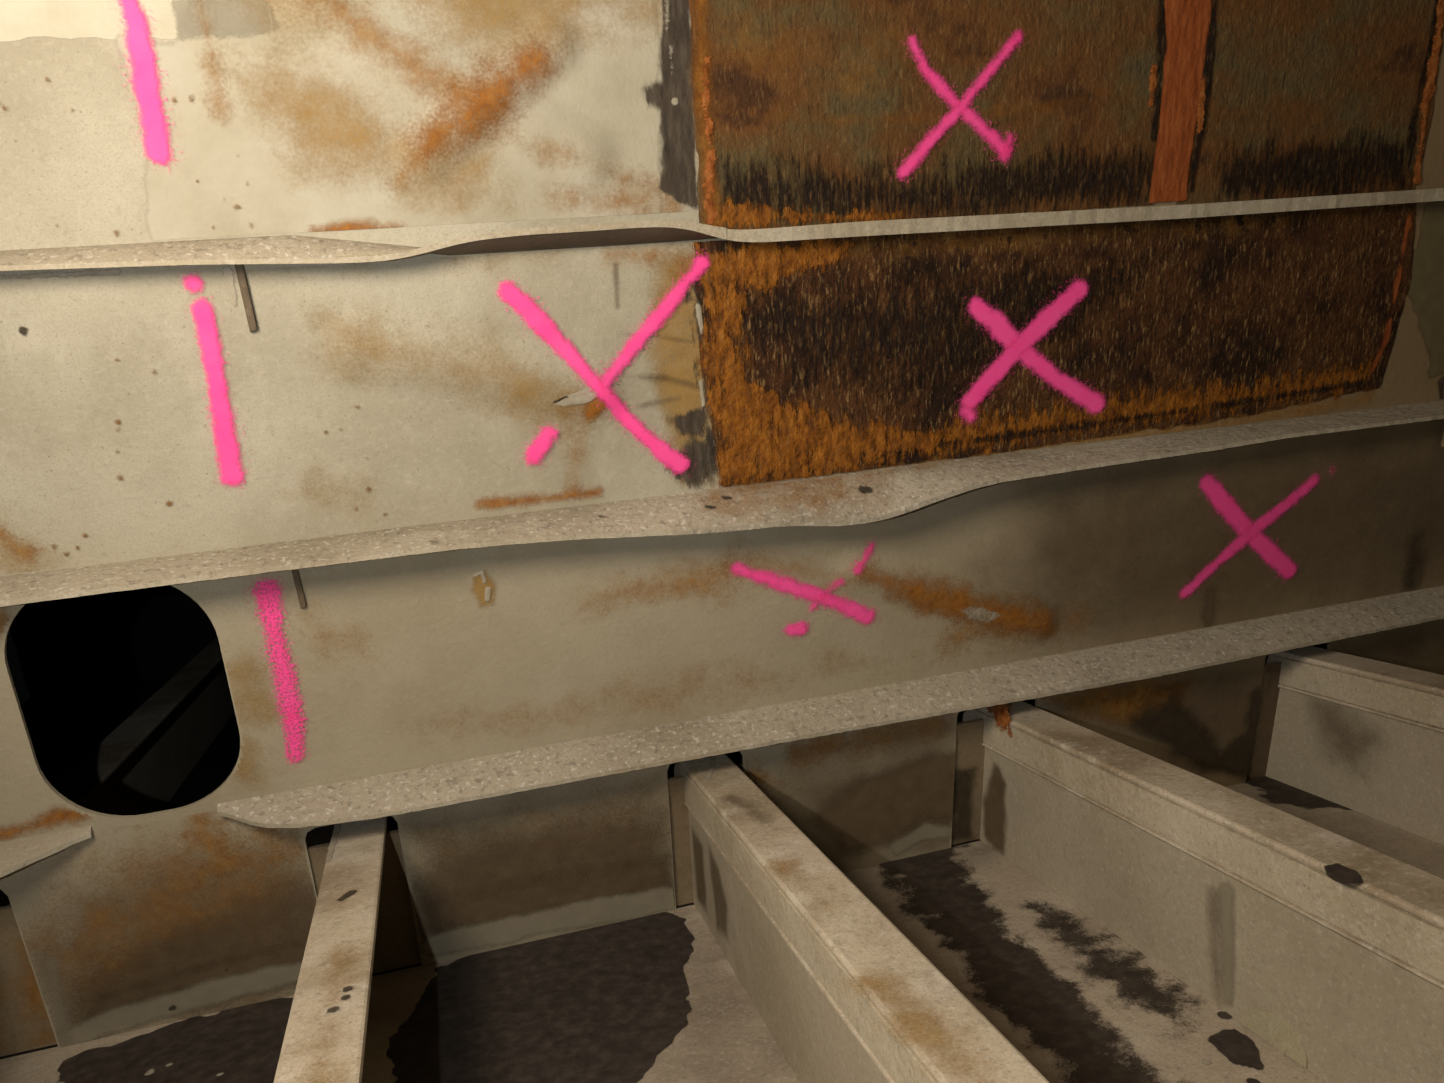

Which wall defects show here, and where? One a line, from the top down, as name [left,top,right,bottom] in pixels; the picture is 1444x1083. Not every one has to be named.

corrosion [270,7,550,182]
corrosion [689,0,1444,488]
corrosion [863,572,1051,637]
water stain [52,888,316,1083]
water stain [387,821,695,1083]
water stain [811,754,1199,1083]
water stain [1203,883,1264,1083]
water stain [1324,863,1363,884]